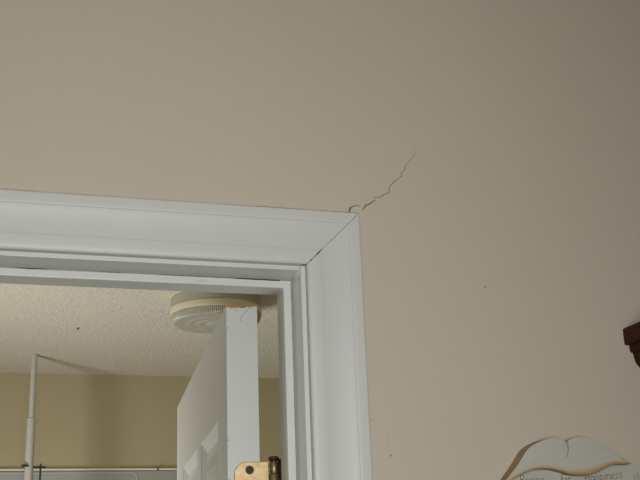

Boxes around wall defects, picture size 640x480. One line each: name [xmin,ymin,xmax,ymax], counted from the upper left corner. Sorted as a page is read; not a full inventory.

crack [228,154,415,265]